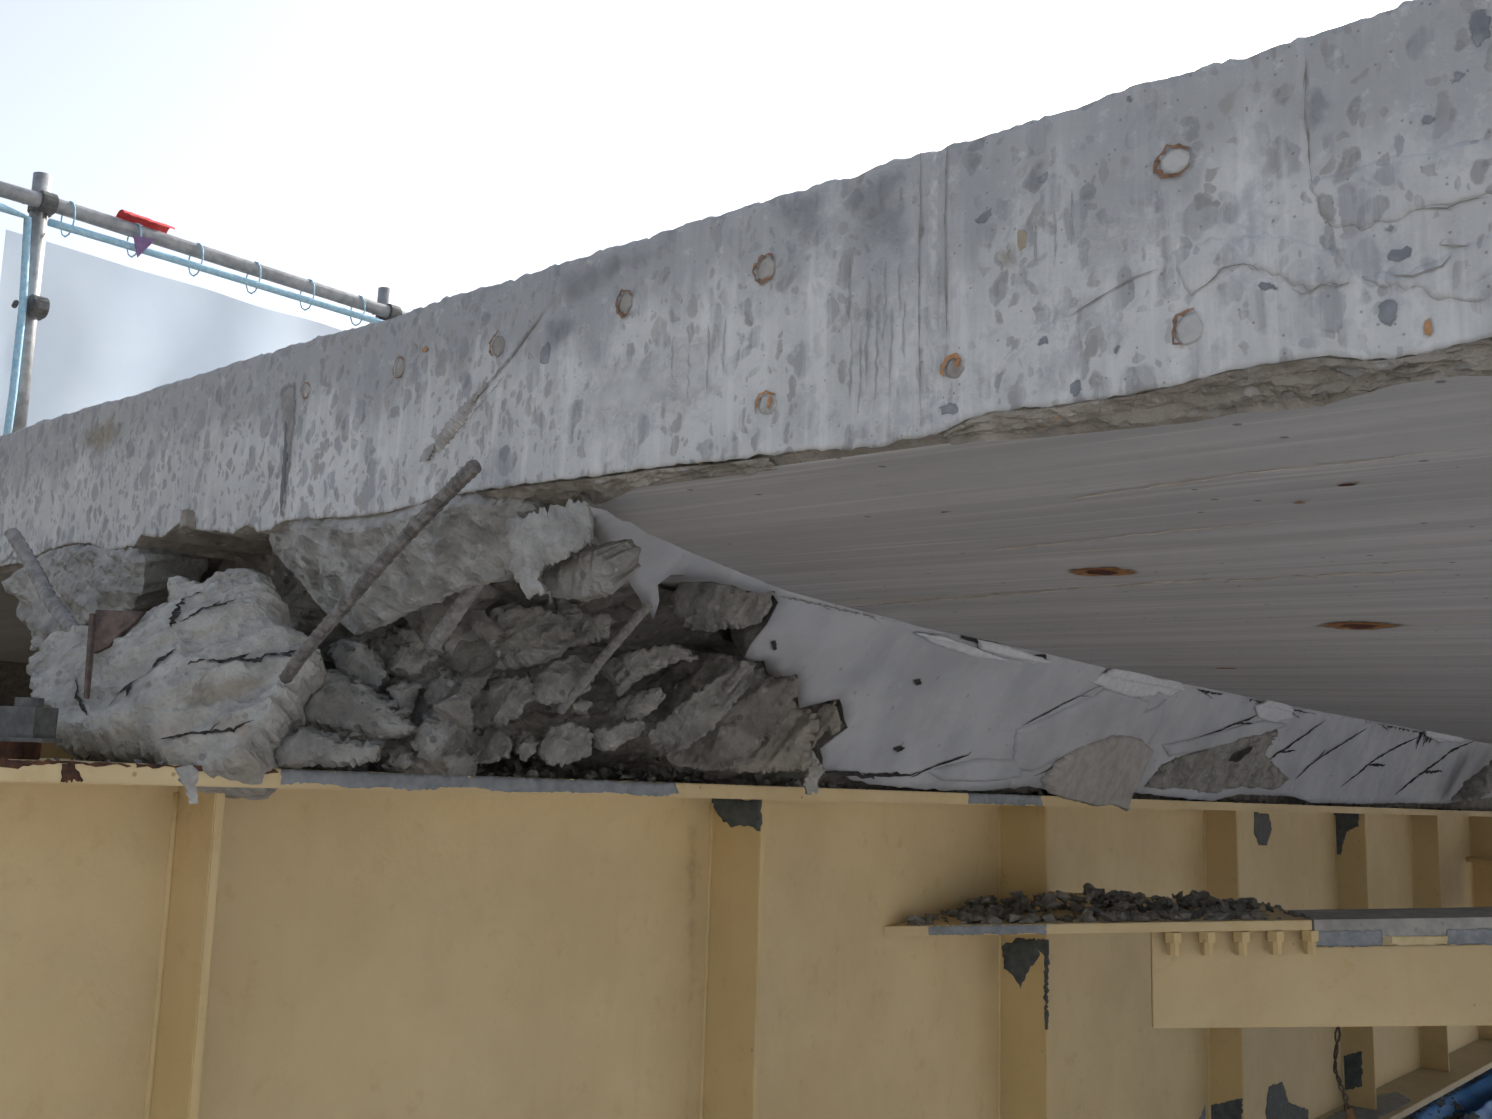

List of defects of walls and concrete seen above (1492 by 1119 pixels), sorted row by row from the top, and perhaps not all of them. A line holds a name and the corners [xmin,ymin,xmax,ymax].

rust [1153,143,1190,179]
crack [1390,197,1486,277]
crack [1191,260,1264,295]
crack [1291,276,1349,297]
rust [939,353,964,379]
spalling [279,457,777,684]
rust [1070,567,1136,576]
spalling [1,528,209,652]
rust [1322,622,1397,630]
peeling [265,769,679,797]
peeling [712,798,763,831]
peeling [928,924,1050,1030]